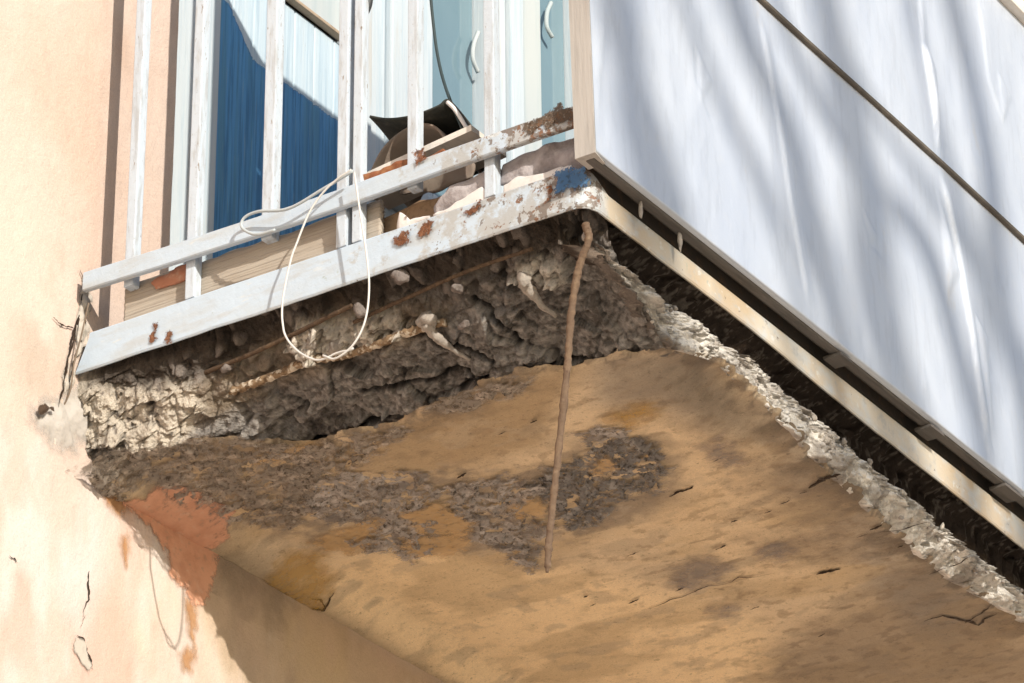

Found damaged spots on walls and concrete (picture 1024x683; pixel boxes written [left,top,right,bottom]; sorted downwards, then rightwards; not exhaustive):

rust [523,102,573,137]
rust [363,147,446,180]
rust [393,220,434,246]
crack [53,270,86,408]
rust [149,322,173,344]
spalling [62,209,1024,623]
crack [74,573,93,670]
crack [926,606,996,626]